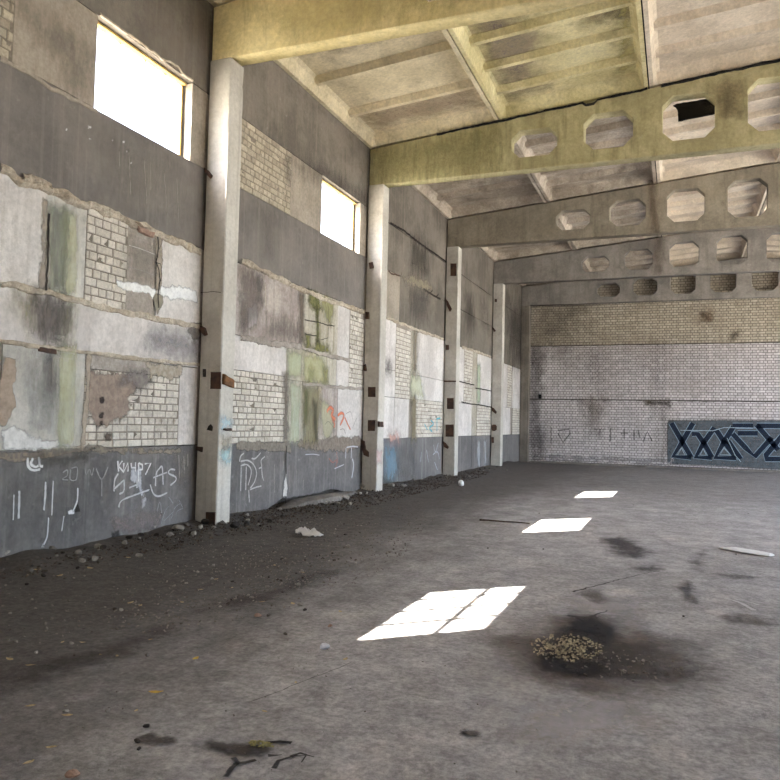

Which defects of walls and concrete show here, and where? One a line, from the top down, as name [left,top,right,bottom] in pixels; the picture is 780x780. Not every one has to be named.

crack [43,213,51,291]
spalling [0,162,202,339]
crack [390,222,446,262]
peeling [0,339,206,462]